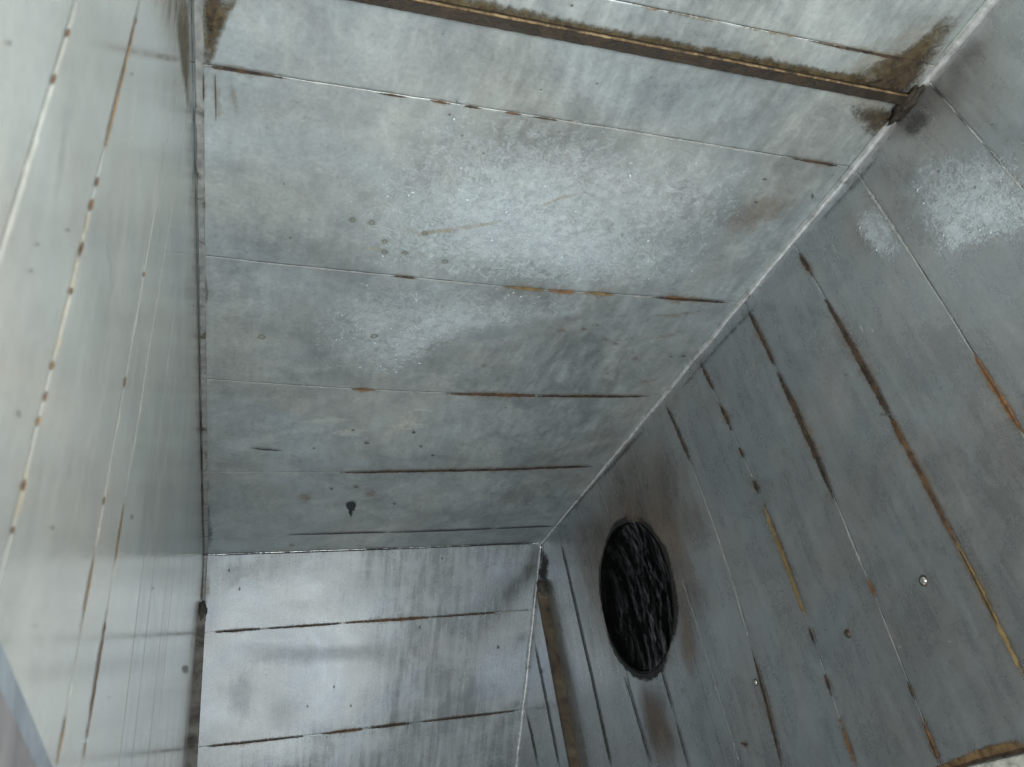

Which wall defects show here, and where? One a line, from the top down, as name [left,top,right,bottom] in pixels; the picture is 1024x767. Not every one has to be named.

rust [744,27,917,63]
rust [105,19,137,149]
rust [504,286,613,296]
rust [747,311,835,501]
rust [824,299,1024,680]
rust [752,480,815,645]
rust [216,612,496,633]
rust [209,736,304,747]
rust [323,723,409,735]
rust [423,711,514,722]